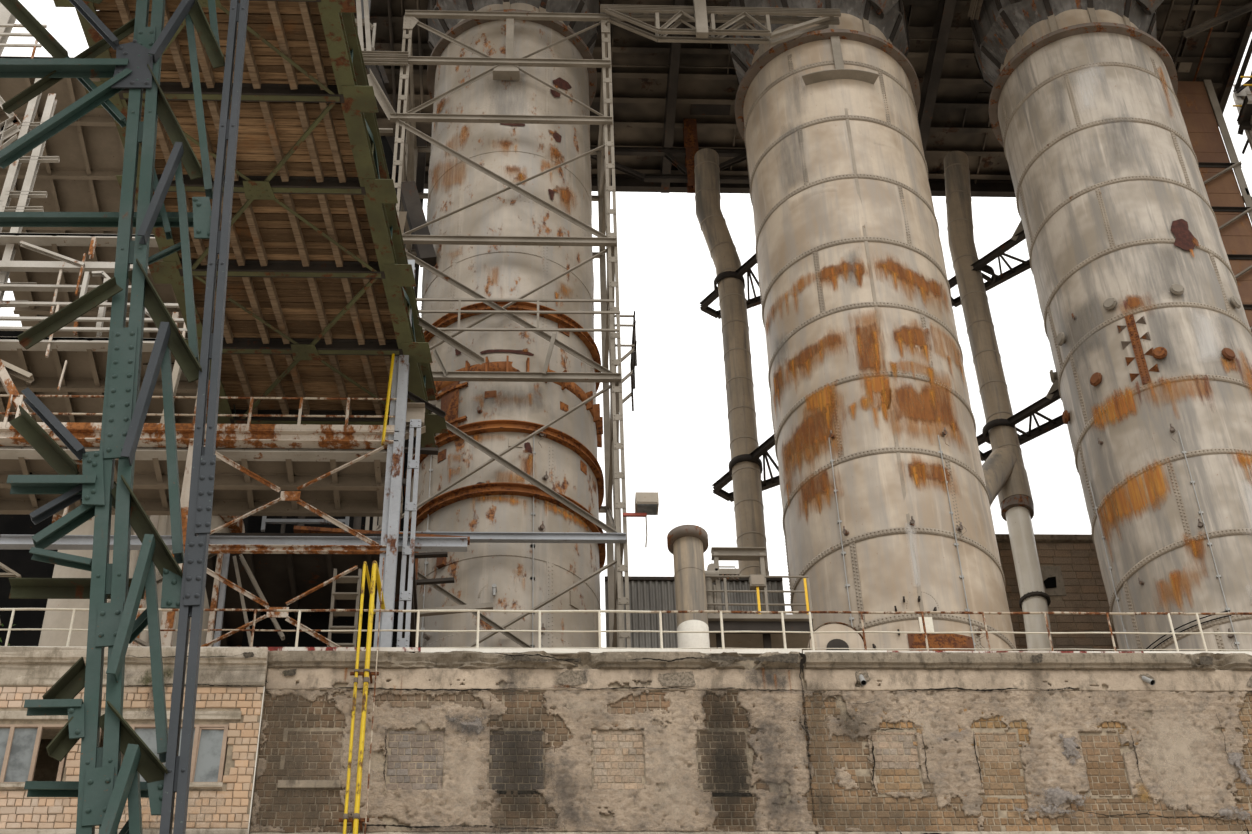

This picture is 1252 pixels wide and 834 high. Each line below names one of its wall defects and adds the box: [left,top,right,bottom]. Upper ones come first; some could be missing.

spalling [701,653,798,663]
crack [319,822,556,830]
peeling [607,671,771,832]
crack [311,653,1080,828]
peeling [790,676,1252,832]